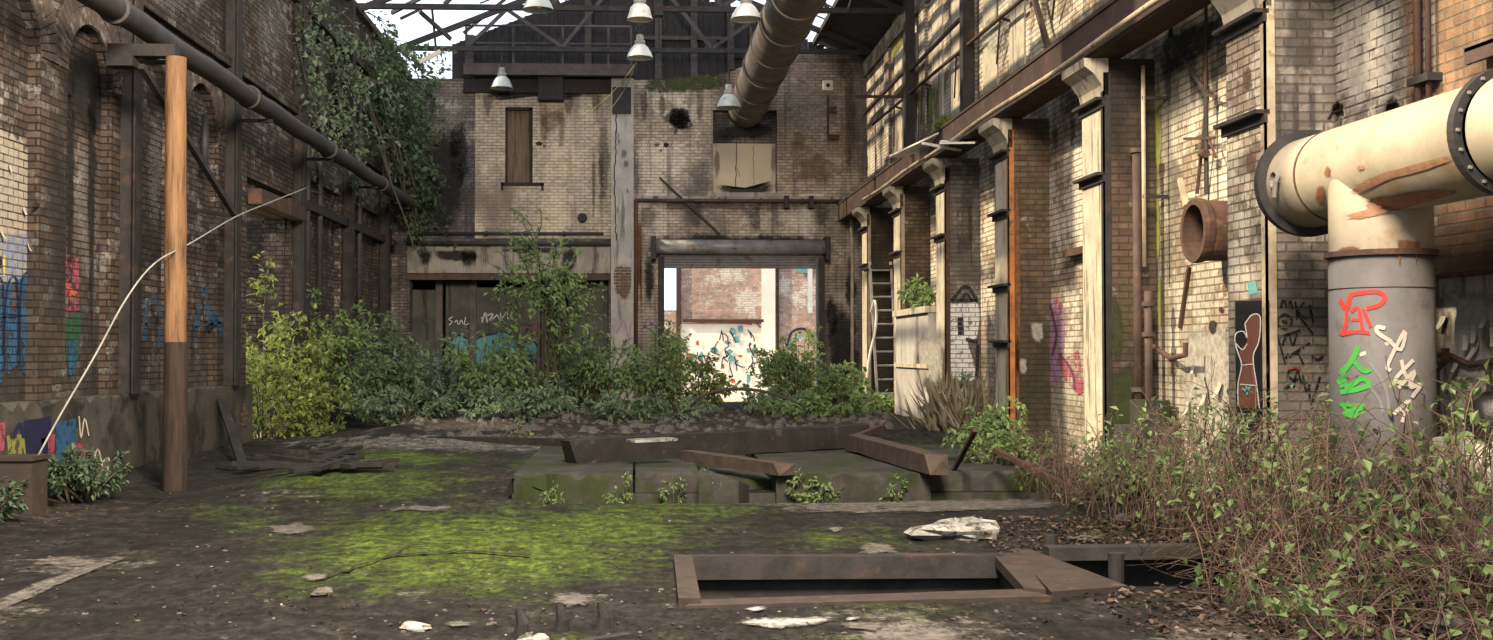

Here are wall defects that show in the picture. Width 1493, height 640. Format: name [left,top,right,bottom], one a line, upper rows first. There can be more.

spalling [654,108,692,152]
corrosion [1315,166,1330,205]
corrosion [1348,156,1455,219]